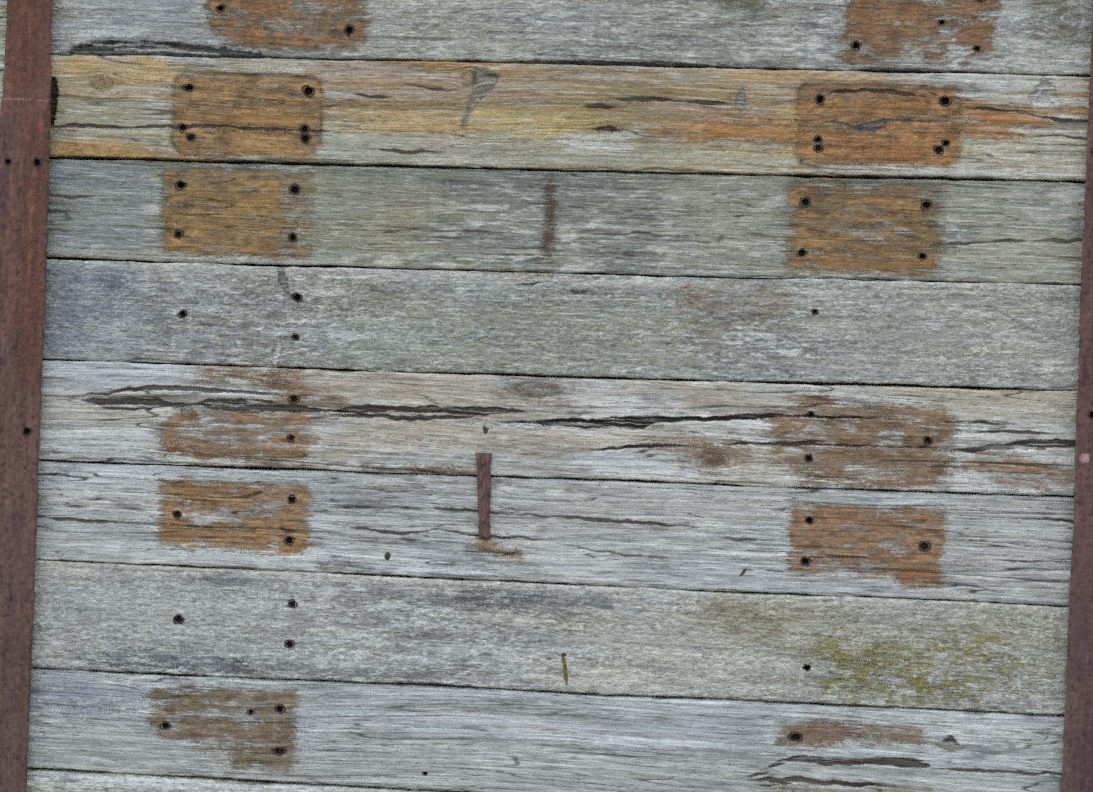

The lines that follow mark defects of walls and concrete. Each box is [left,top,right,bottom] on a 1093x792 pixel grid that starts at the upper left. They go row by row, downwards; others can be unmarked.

corrosion [203,0,372,51]
corrosion [838,0,1002,68]
corrosion [158,72,326,260]
corrosion [646,80,1047,278]
crack [83,385,864,451]
corrosion [764,395,1075,493]
crack [907,421,1076,452]
corrosion [156,479,312,555]
corrosion [785,503,947,588]
crack [747,756,1062,787]